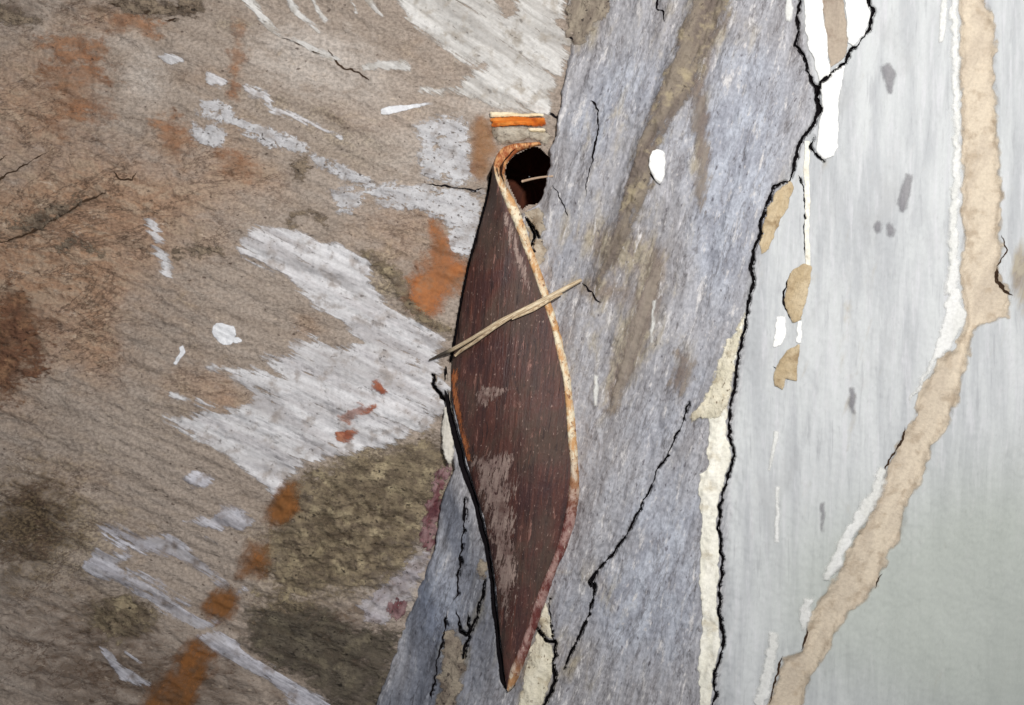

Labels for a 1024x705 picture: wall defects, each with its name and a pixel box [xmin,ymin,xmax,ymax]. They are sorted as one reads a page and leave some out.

corrosion [472,112,546,173]
corrosion [406,221,467,315]
crack [712,0,875,705]
spalling [754,0,1010,705]
corrosion [335,380,387,443]
crack [430,173,506,699]
crack [884,431,905,478]
corrosion [268,483,299,525]
crack [536,404,689,705]
peeling [690,318,745,705]
corrosion [203,589,237,618]
corrosion [146,640,217,705]